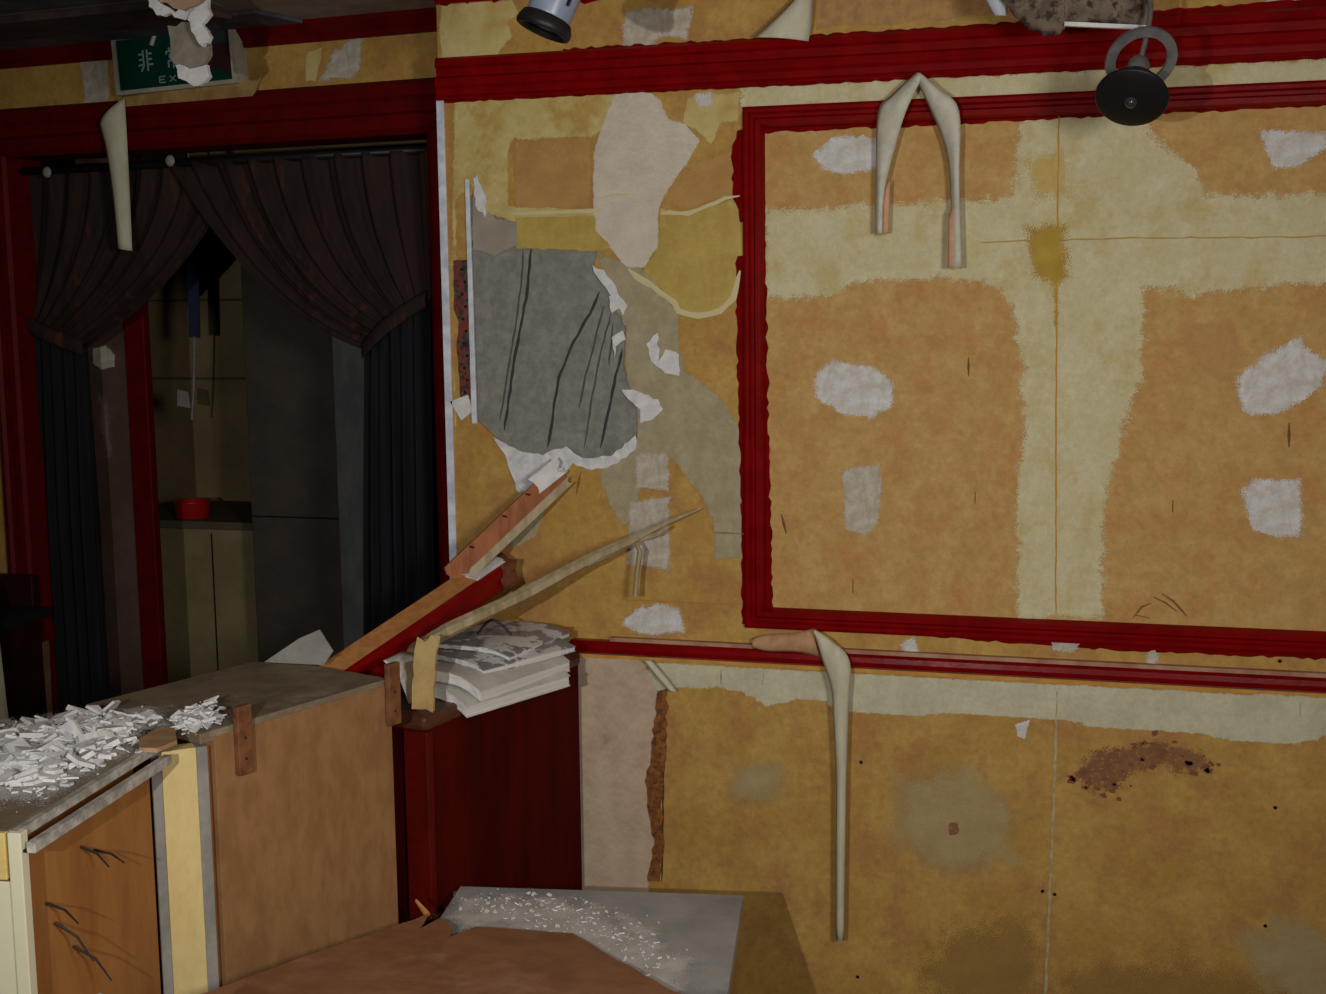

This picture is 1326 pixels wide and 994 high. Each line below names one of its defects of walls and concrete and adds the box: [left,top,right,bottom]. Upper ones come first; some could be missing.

flaking render [450,92,742,560]
leakage [1012,145,1080,327]
flaking render [578,657,658,892]
leakage [875,749,1033,889]